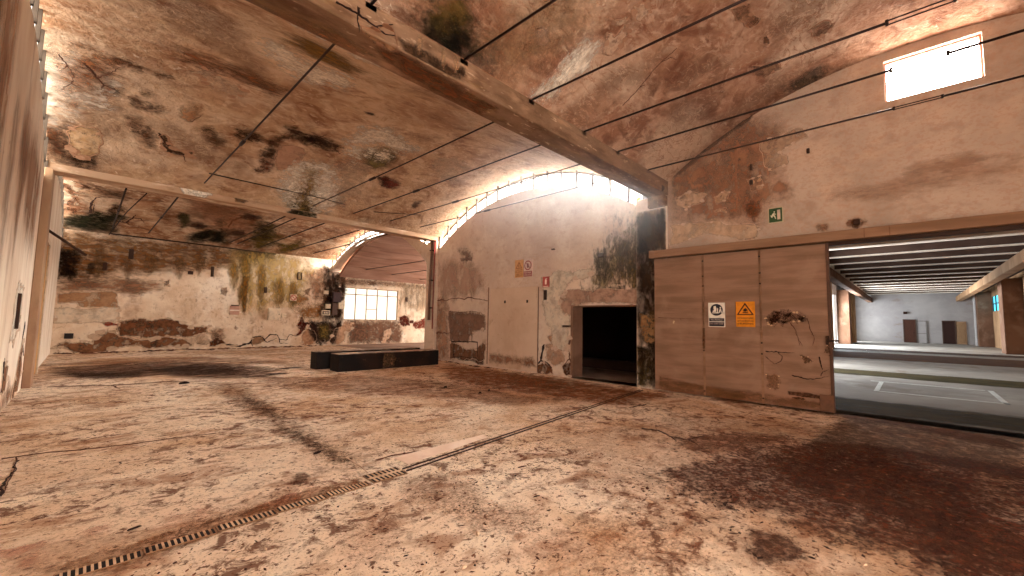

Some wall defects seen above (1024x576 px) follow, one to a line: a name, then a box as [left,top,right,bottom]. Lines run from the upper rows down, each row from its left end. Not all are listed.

leakage [262,0,600,113]
flaking render [64,125,105,161]
leakage [21,45,162,233]
leakage [202,111,418,218]
peeling [670,190,760,246]
leakage [57,185,402,345]
leakage [594,123,788,386]
flaking render [50,306,238,353]
crack [226,334,294,347]
flaking render [448,311,486,365]
peeling [764,309,805,326]
crack [765,318,828,380]